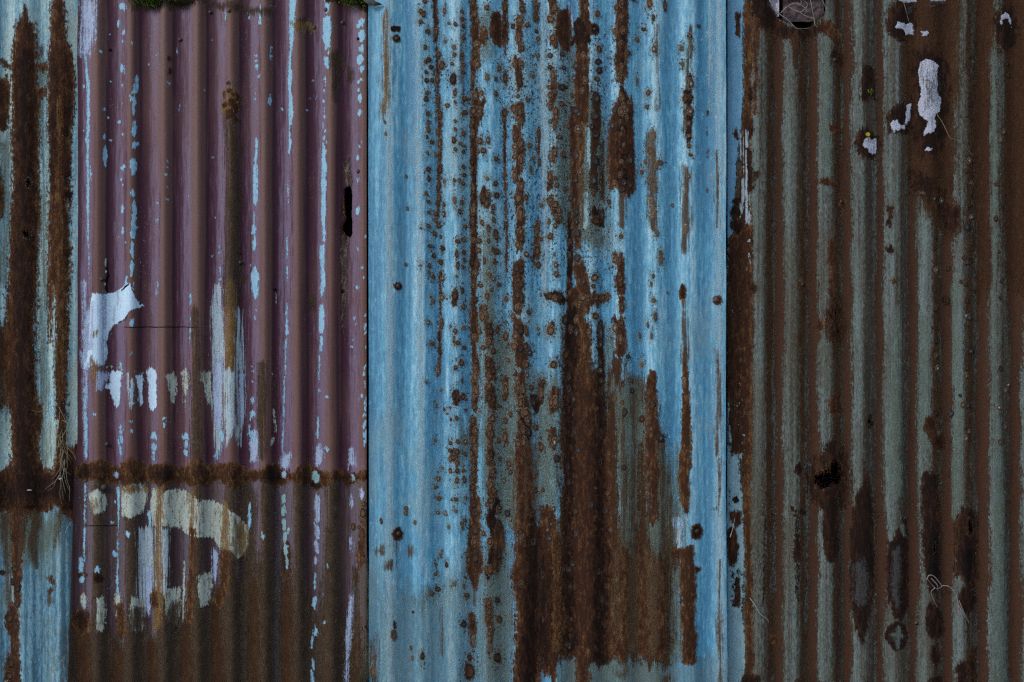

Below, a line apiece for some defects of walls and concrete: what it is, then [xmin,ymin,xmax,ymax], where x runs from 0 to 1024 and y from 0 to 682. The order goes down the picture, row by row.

peeling [78,0,133,325]
peeling [103,64,141,290]
corrosion [677,24,709,159]
peeling [890,59,941,151]
peeling [81,369,96,460]
corrosion [0,0,376,682]
corrosion [404,0,703,682]
corrosion [712,0,1024,682]
peeling [78,483,101,583]
peeling [110,487,130,594]